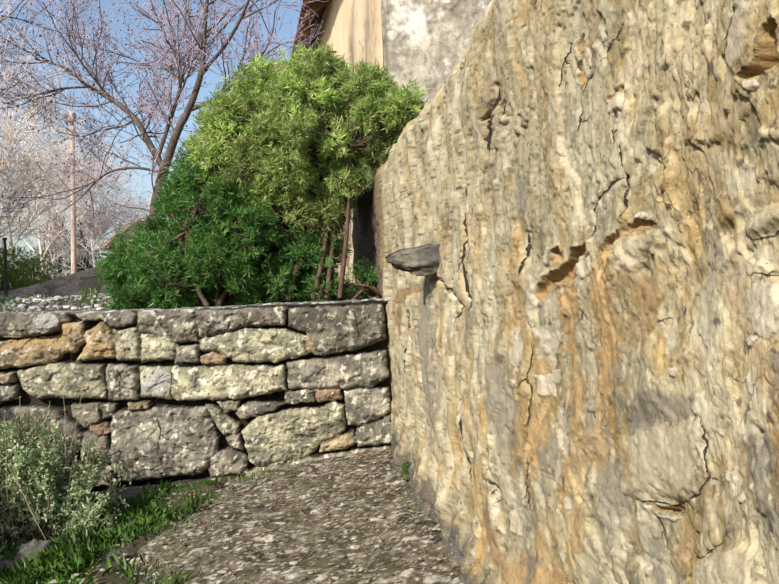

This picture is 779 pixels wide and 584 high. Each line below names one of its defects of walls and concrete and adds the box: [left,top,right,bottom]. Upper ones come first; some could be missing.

crack [724,0,735,56]
spalling [740,20,779,91]
crack [481,89,507,158]
crack [588,126,630,238]
crack [439,213,472,320]
crack [518,233,533,276]
spalling [534,244,592,302]
spalling [602,211,657,254]
crack [745,228,779,246]
crack [517,322,533,426]
crack [524,457,532,511]
crack [631,420,718,549]